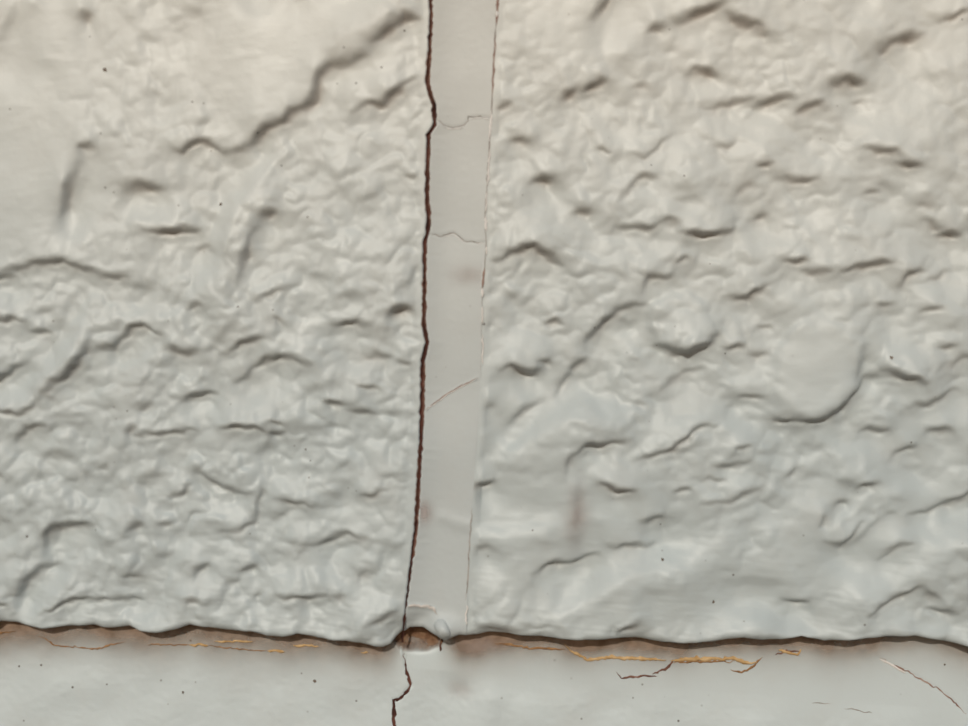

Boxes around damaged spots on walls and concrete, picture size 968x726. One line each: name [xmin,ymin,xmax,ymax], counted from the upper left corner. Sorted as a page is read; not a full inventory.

crack [391,0,499,726]
crack [879,657,963,711]